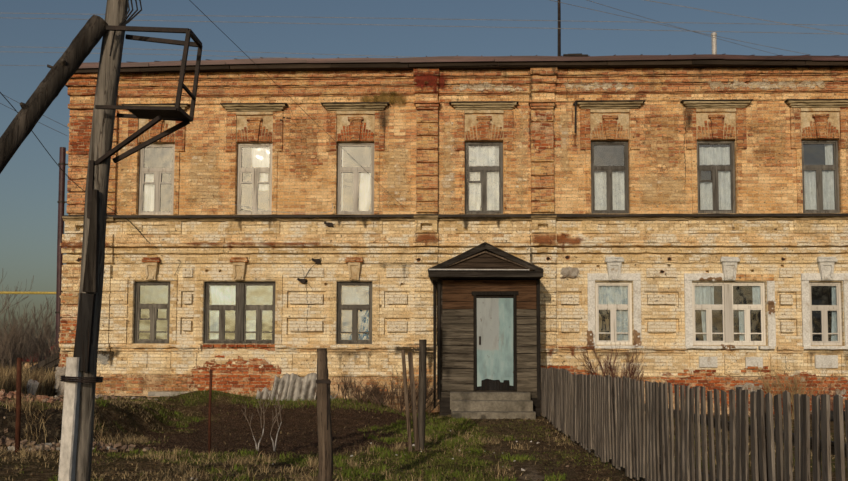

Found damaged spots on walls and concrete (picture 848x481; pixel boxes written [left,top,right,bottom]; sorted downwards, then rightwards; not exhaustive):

spalling [66,113,93,157]
spalling [58,314,77,368]
spalling [95,372,148,395]
spalling [160,343,282,395]
spalling [631,366,848,415]